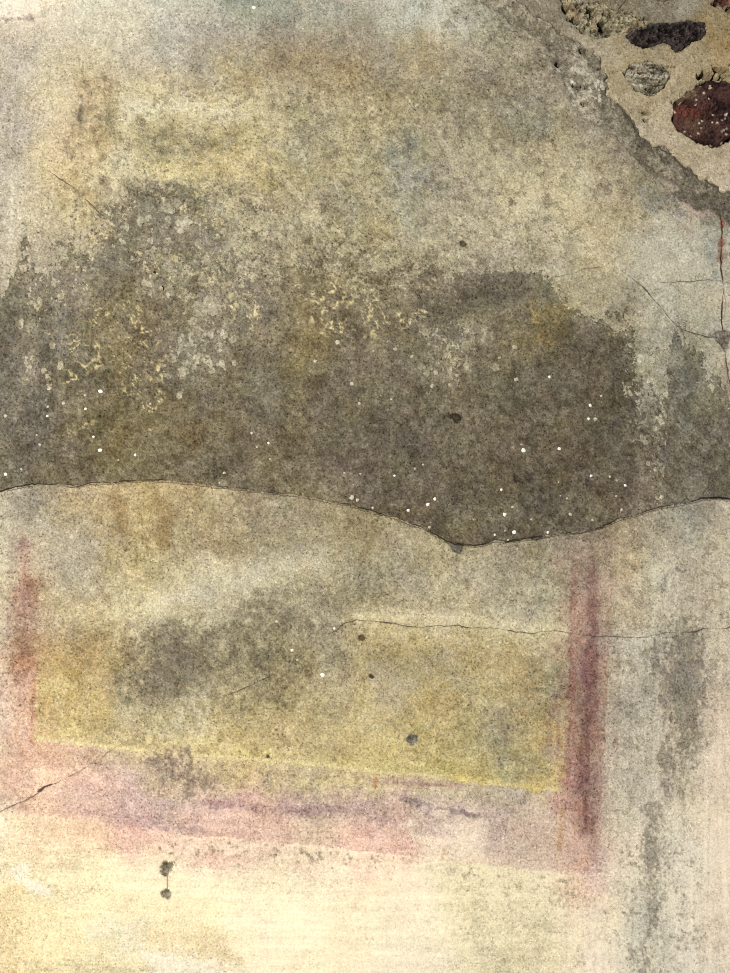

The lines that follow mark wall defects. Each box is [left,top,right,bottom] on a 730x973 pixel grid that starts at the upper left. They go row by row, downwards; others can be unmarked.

spalling [476,0,730,224]
crack [622,217,730,400]
water stain [0,129,730,545]
crack [0,479,169,492]
crack [334,501,539,546]
crack [567,506,665,534]
crack [691,495,730,503]
crack [328,619,480,634]
water stain [133,609,302,698]
water stain [651,625,708,773]
crack [0,774,73,812]